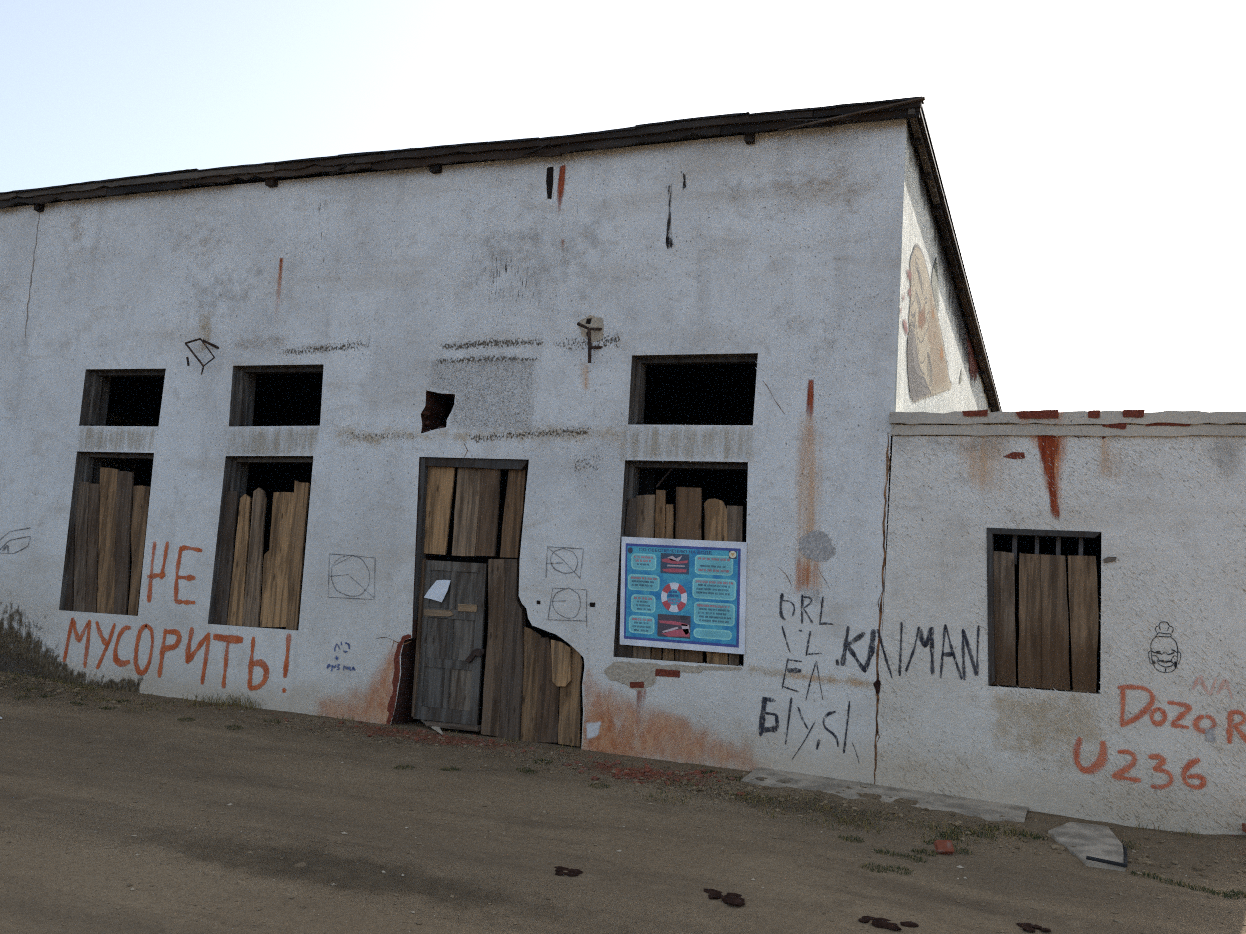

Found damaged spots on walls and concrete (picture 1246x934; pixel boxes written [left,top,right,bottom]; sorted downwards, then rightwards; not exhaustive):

rust [1038,435,1061,517]
rust [328,659,393,722]
flaking render [604,661,741,690]
flaking render [586,722,601,738]
rust [591,691,705,758]